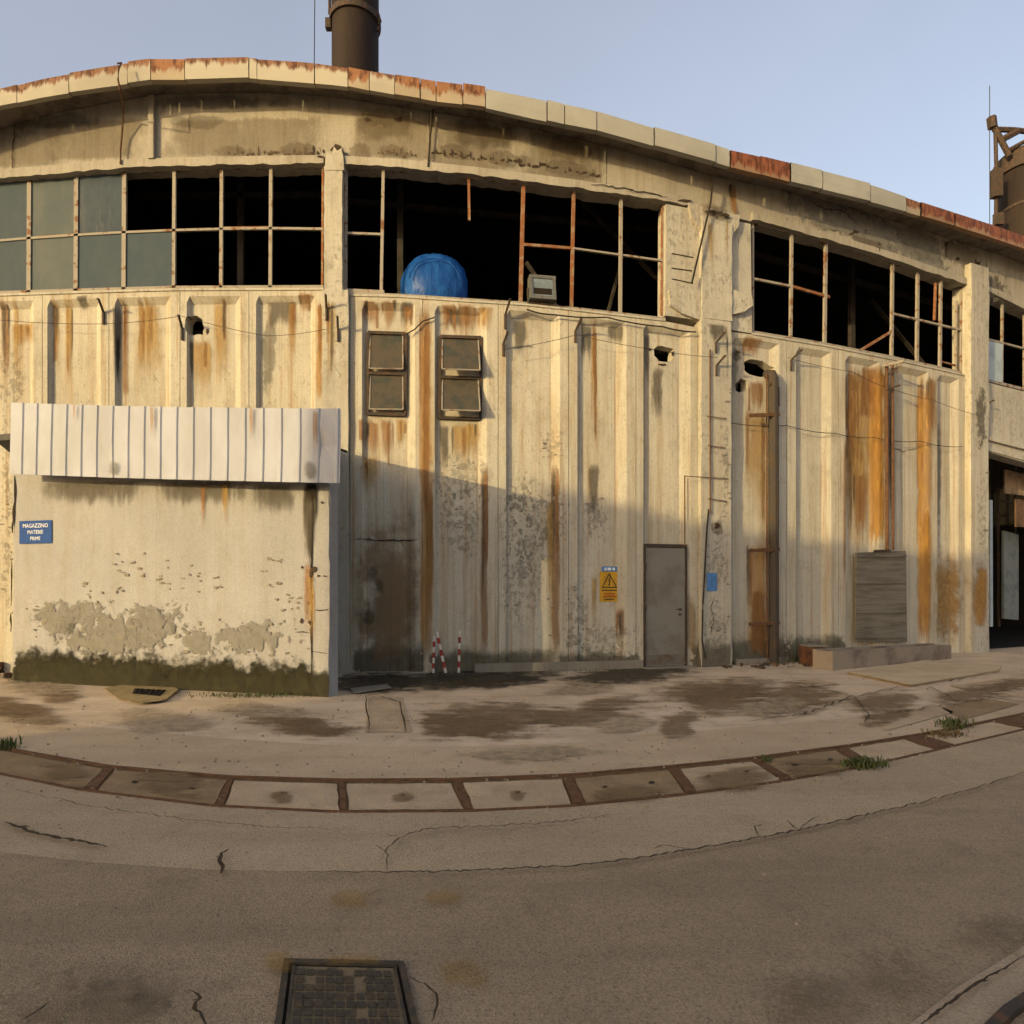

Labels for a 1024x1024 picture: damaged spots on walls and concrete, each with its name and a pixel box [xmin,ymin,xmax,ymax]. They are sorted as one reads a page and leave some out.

peeling [25,552,311,658]